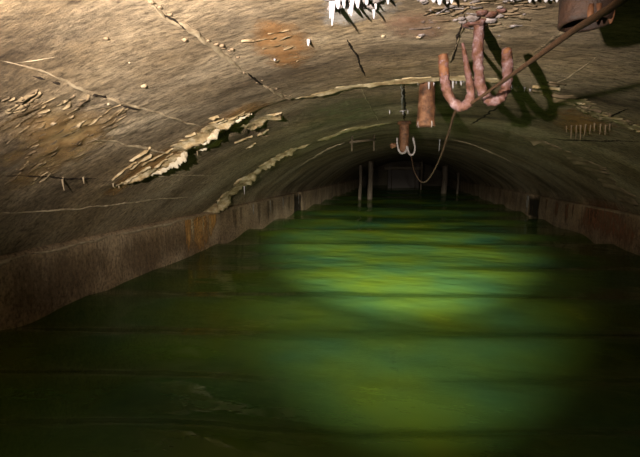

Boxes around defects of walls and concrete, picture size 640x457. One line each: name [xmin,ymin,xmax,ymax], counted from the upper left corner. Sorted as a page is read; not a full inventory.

peeling [1,89,130,160]
crack [0,57,204,128]
spalling [112,112,283,188]
crack [148,0,291,100]
crack [347,40,379,121]